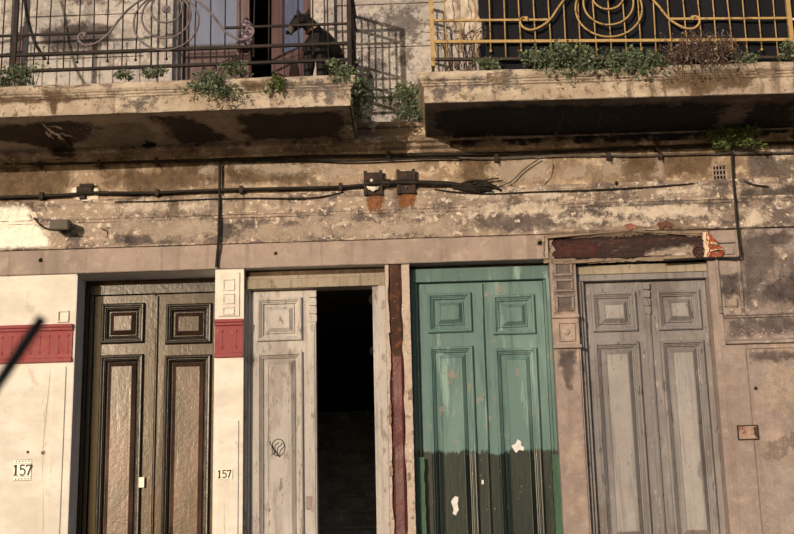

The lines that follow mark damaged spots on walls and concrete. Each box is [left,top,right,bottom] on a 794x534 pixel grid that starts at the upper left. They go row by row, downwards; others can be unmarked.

damp [358,4,427,116]
damp [0,92,232,160]
damp [236,78,349,145]
damp [428,70,752,183]
peeling [0,205,51,249]
damp [0,165,71,202]
peeling [101,198,217,242]
corrosion [366,195,383,215]
corrosion [398,192,417,207]
spalling [231,157,724,264]
damp [474,196,710,232]
peeling [602,151,621,187]